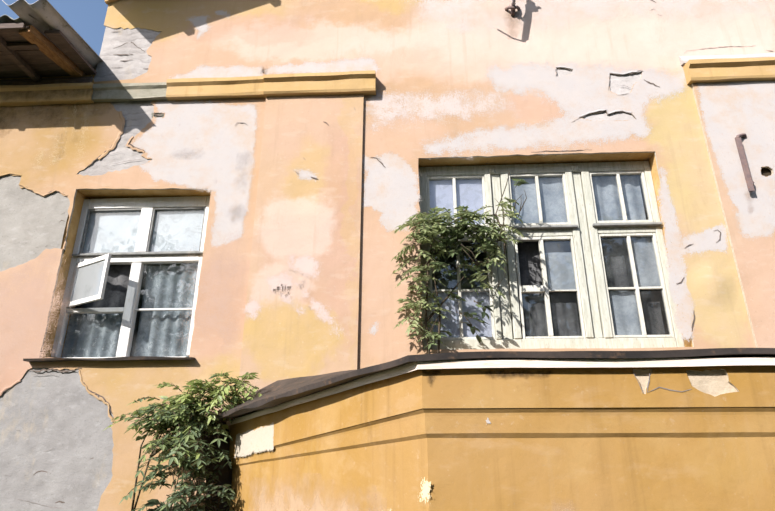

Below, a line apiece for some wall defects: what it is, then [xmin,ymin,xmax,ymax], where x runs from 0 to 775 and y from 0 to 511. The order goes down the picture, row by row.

flaking render [94,26,160,82]
peeling [78,100,263,359]
peeling [361,57,775,241]
peeling [656,167,728,341]
flaking render [0,173,114,511]
peeling [234,422,274,458]
flaking render [633,369,652,394]
flaking render [686,369,737,396]